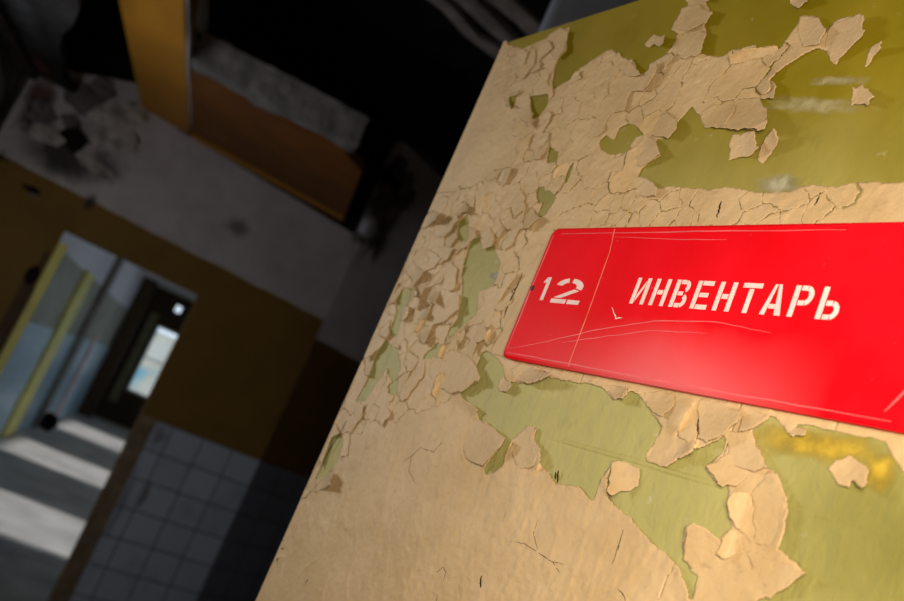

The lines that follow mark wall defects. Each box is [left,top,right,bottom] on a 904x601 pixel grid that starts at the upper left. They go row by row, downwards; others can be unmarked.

spalling [25,76,149,179]
peeling [300,0,904,500]
peeling [580,374,904,601]